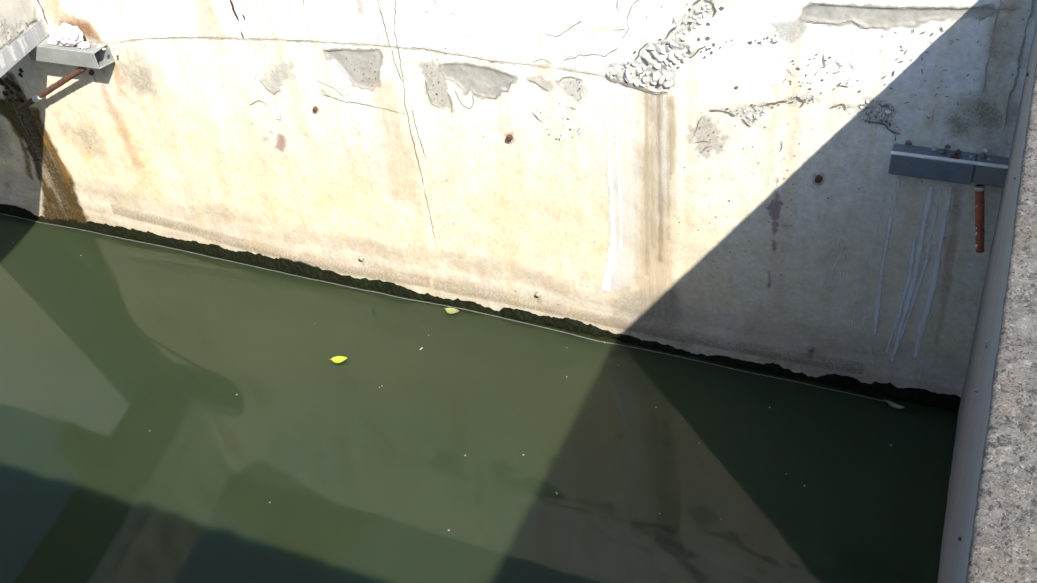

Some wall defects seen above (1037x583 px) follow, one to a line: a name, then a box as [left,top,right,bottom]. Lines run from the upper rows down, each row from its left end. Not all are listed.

rust [17,67,87,111]
spalling [323,48,383,91]
crack [115,0,638,247]
spalling [420,59,583,140]
spalling [628,4,733,90]
spalling [725,54,933,128]
peeling [800,2,1017,89]
leakage [601,83,675,318]
rust [974,184,985,253]
leakage [885,186,956,362]